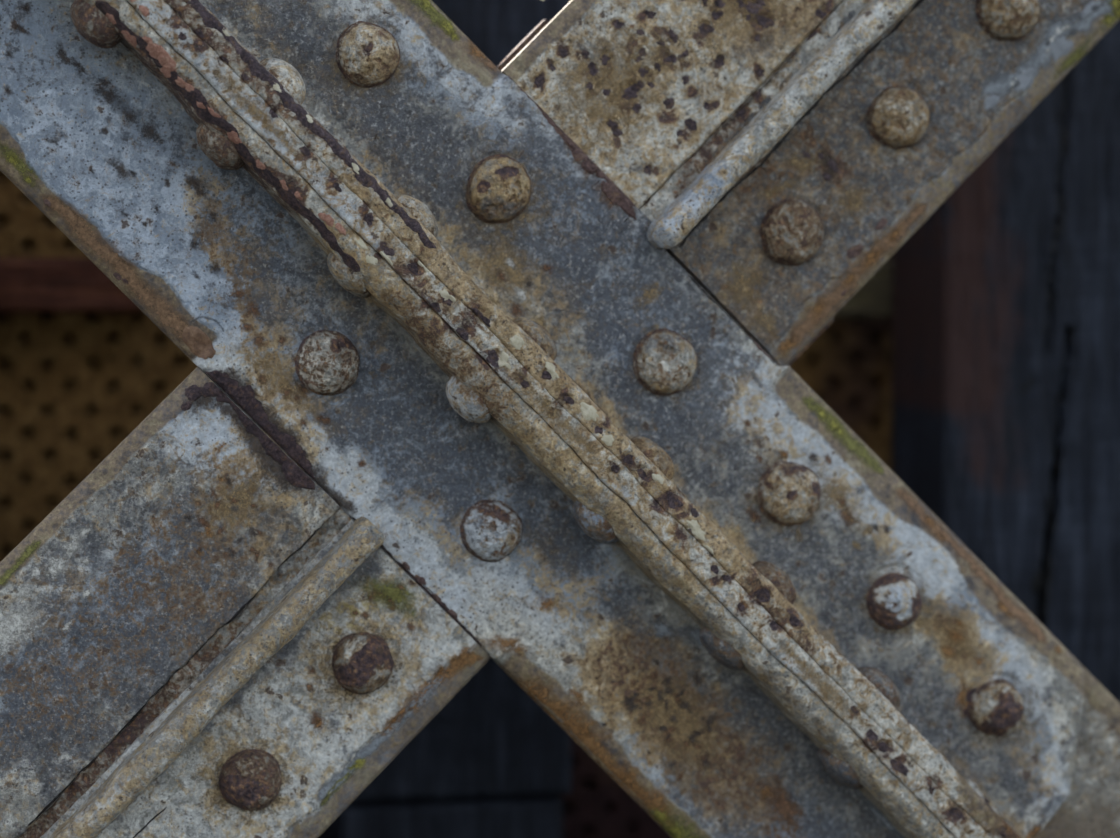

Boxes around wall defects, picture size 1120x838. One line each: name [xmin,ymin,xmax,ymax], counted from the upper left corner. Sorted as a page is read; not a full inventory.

rust [15,3,31,34]
rust [58,45,85,72]
rust [124,112,161,142]
rust [182,0,436,248]
rust [107,161,136,178]
rust [565,136,637,220]
rust [0,171,355,567]
rust [779,203,927,470]
rust [311,712,322,728]
rust [518,678,672,838]
rust [624,660,715,780]
rust [966,780,1040,838]